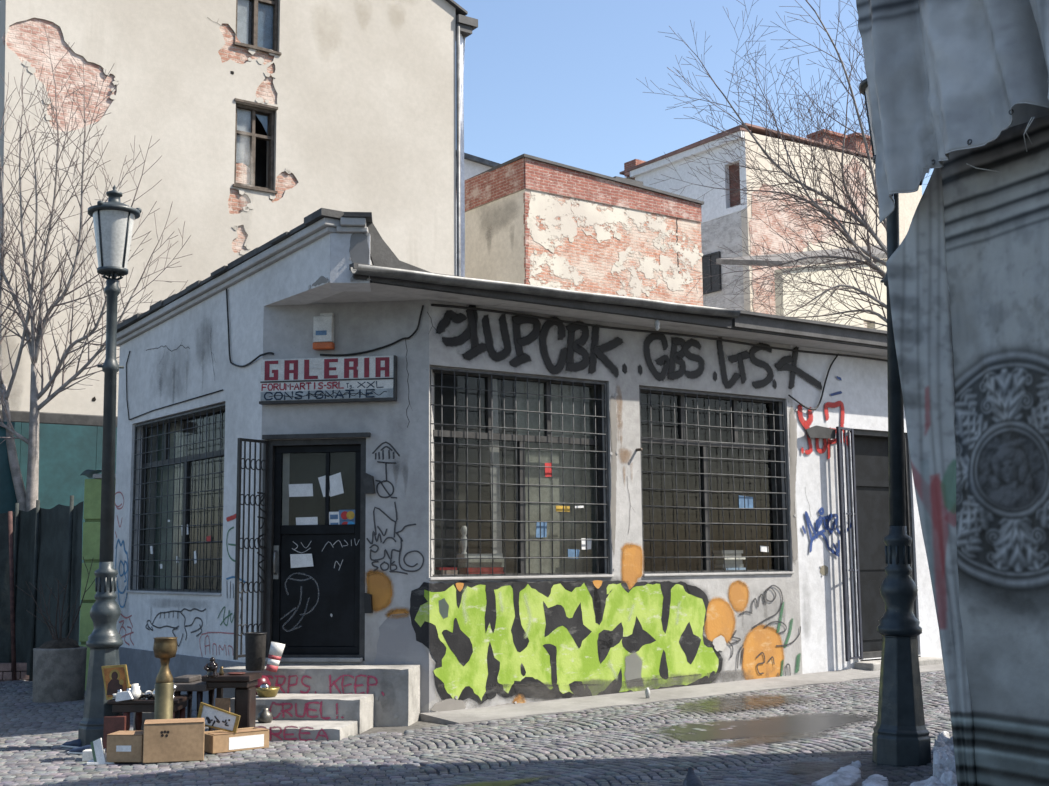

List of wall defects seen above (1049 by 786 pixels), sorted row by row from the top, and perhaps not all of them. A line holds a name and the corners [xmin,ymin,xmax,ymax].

peeling [2,18,119,131]
peeling [218,24,277,104]
peeling [228,188,254,255]
peeling [269,167,298,202]
peeling [527,190,703,298]